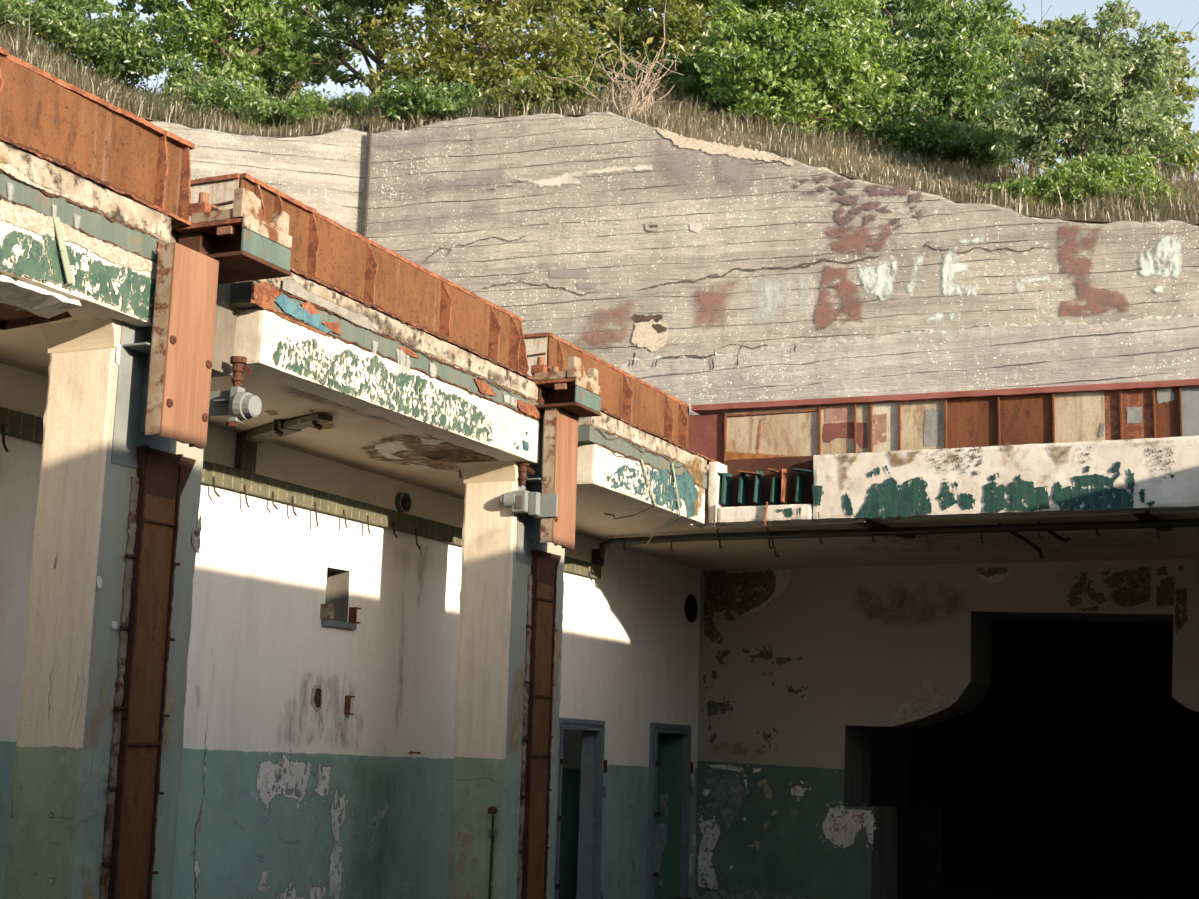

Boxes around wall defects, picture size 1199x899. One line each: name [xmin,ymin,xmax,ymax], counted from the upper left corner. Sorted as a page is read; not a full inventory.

spalling [0,163,68,198]
peeling [0,199,157,323]
crack [638,255,881,291]
crack [922,242,1048,253]
rust [251,282,342,337]
peeling [273,293,497,470]
rust [474,378,498,396]
rust [516,399,542,420]
crack [631,344,796,370]
peeling [843,462,1155,519]
crack [191,719,208,899]
peeling [251,750,351,899]